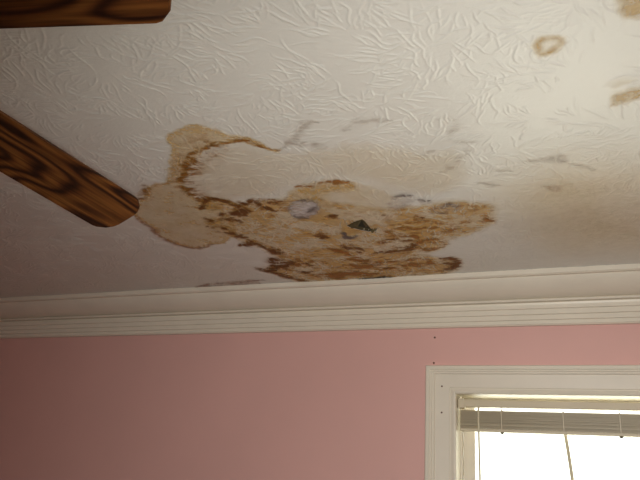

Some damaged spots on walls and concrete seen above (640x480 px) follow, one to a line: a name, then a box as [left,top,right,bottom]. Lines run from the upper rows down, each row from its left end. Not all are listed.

damp [135,125,495,282]
peeling [347,219,378,233]